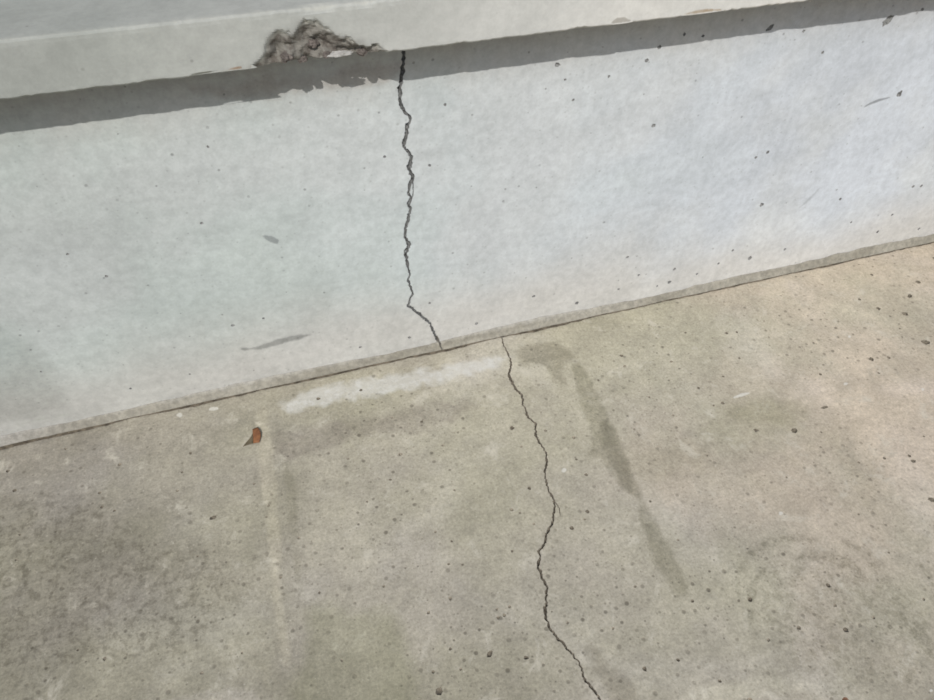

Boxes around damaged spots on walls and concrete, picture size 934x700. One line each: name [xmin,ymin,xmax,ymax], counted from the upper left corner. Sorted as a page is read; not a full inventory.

spalling [241,13,389,70]
crack [397,51,443,351]
crack [501,338,601,700]